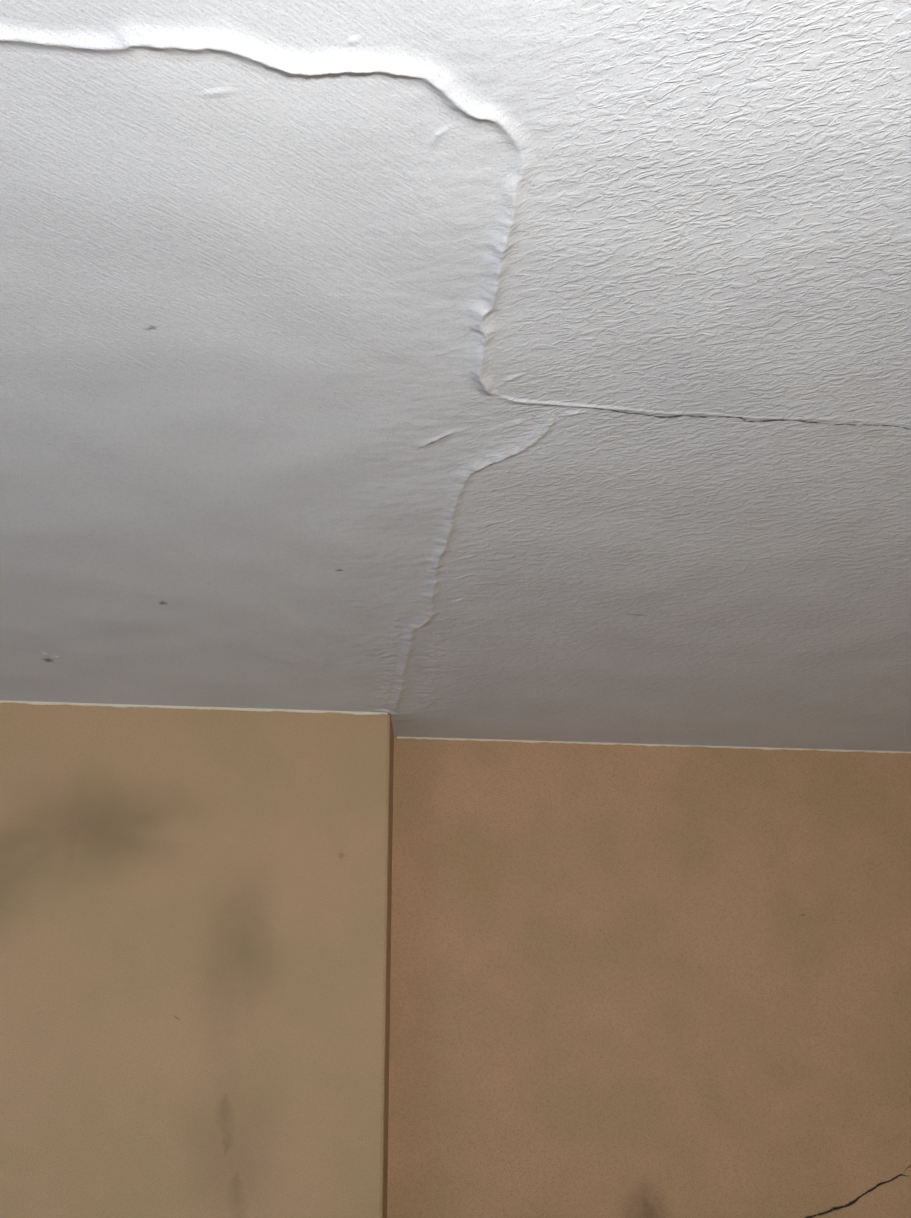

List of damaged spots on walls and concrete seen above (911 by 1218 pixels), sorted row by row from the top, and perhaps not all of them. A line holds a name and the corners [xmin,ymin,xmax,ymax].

crack [496,394,911,429]
crack [805,1165,911,1218]